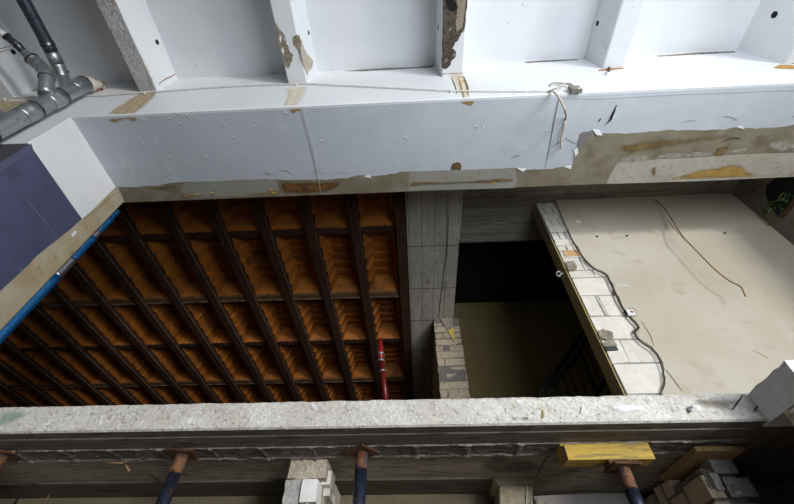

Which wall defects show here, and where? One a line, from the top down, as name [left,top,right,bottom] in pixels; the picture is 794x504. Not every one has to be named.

peeling [276,24,313,74]
peeling [441,0,467,69]
peeling [118,125,794,217]